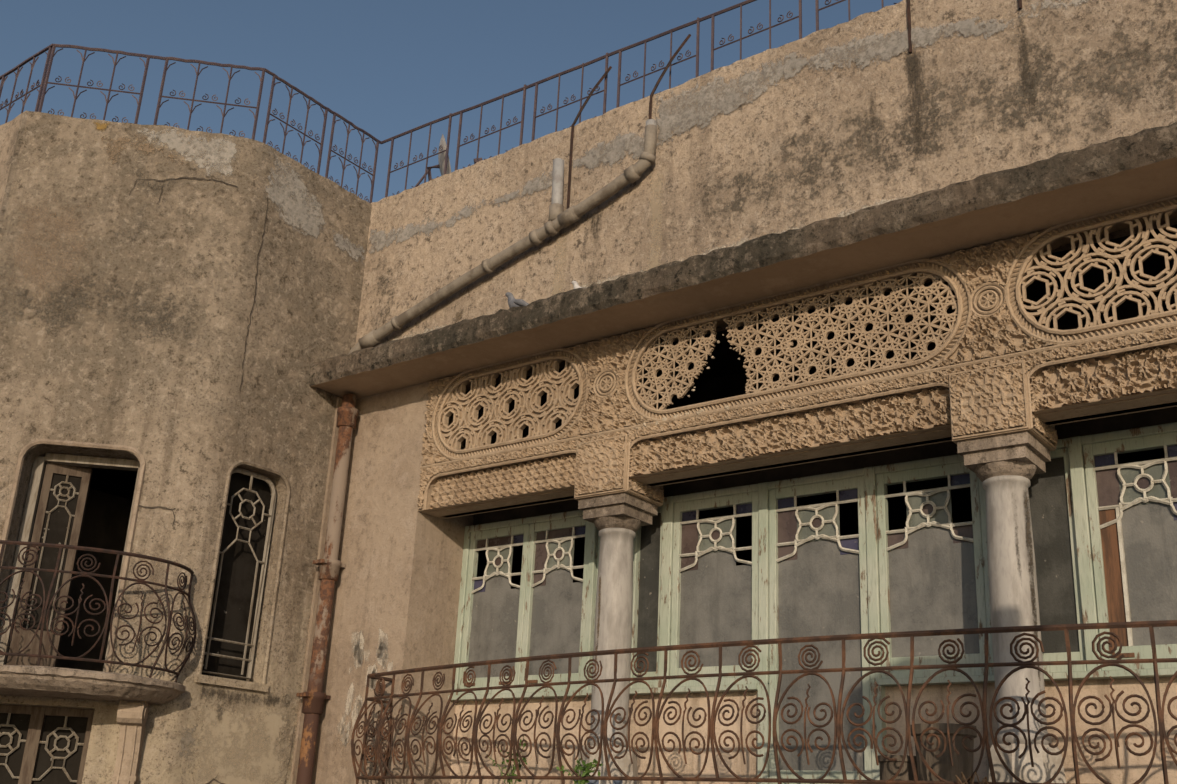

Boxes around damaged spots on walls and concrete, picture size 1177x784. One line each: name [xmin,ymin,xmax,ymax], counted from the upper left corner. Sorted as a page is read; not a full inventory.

crack [129,177,238,204]
damp [698,14,1177,222]
crack [240,197,268,387]